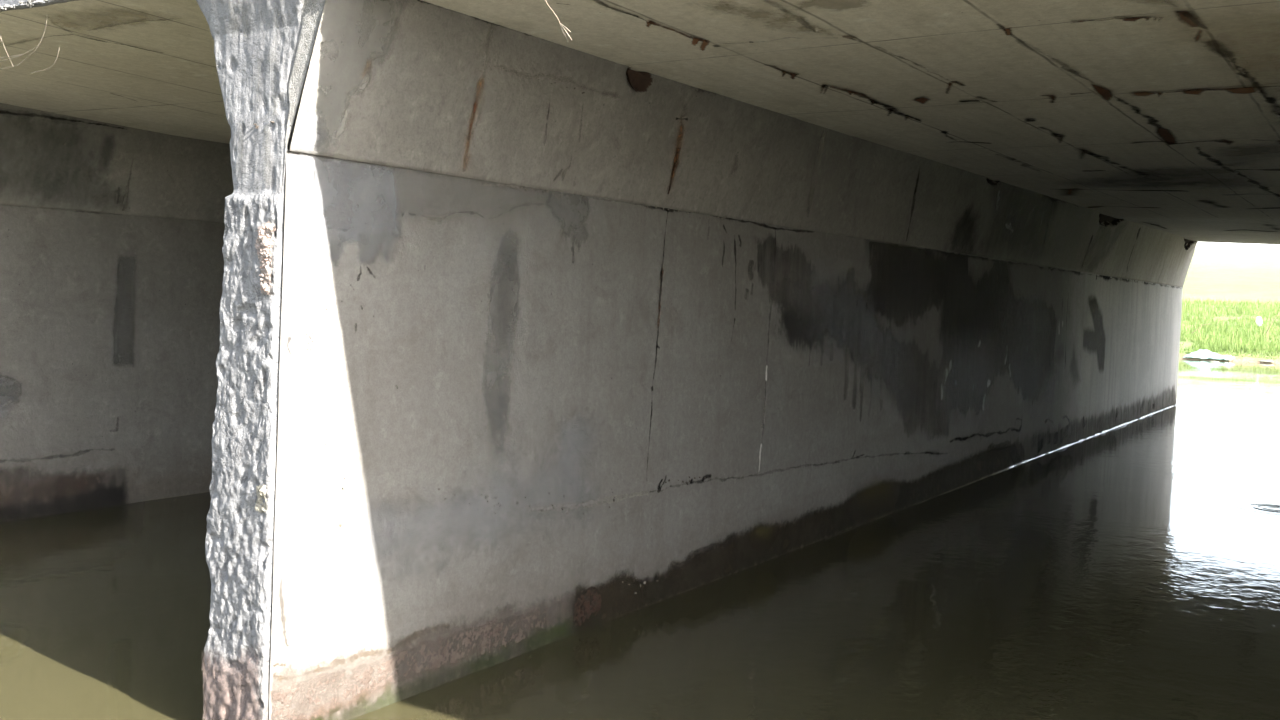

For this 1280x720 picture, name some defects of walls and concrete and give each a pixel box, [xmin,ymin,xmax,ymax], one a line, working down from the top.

spalling [0,0,69,10]
peeling [302,0,398,151]
rust [668,118,688,194]
crack [594,0,1029,166]
crack [901,4,1280,288]
leakage [278,114,400,516]
leakage [484,230,519,451]
crack [605,198,813,493]
leakage [757,208,1057,438]
leakage [1083,297,1105,370]
crack [793,416,1069,468]